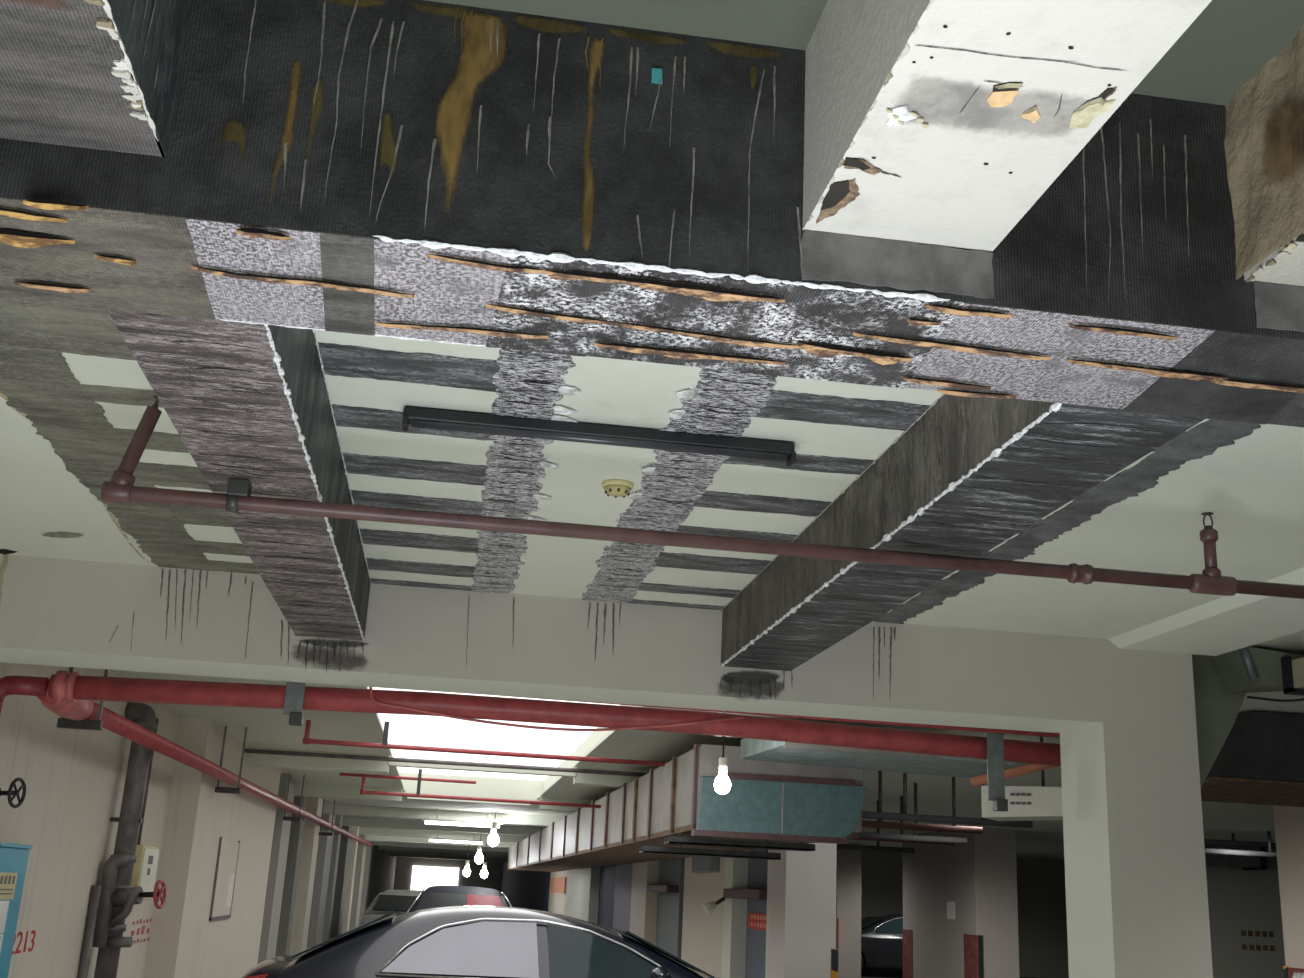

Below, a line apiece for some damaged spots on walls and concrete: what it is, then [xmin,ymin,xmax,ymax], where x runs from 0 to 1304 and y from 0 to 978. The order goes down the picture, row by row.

spalling [84,0,121,41]
spalling [111,58,148,121]
damp [313,0,404,220]
corrosion [437,7,506,202]
damp [513,16,585,176]
damp [610,30,686,144]
peeling [860,100,928,128]
peeling [987,82,1040,123]
peeling [1069,84,1117,129]
spalling [807,141,882,224]
damp [160,569,208,641]
damp [588,603,621,659]